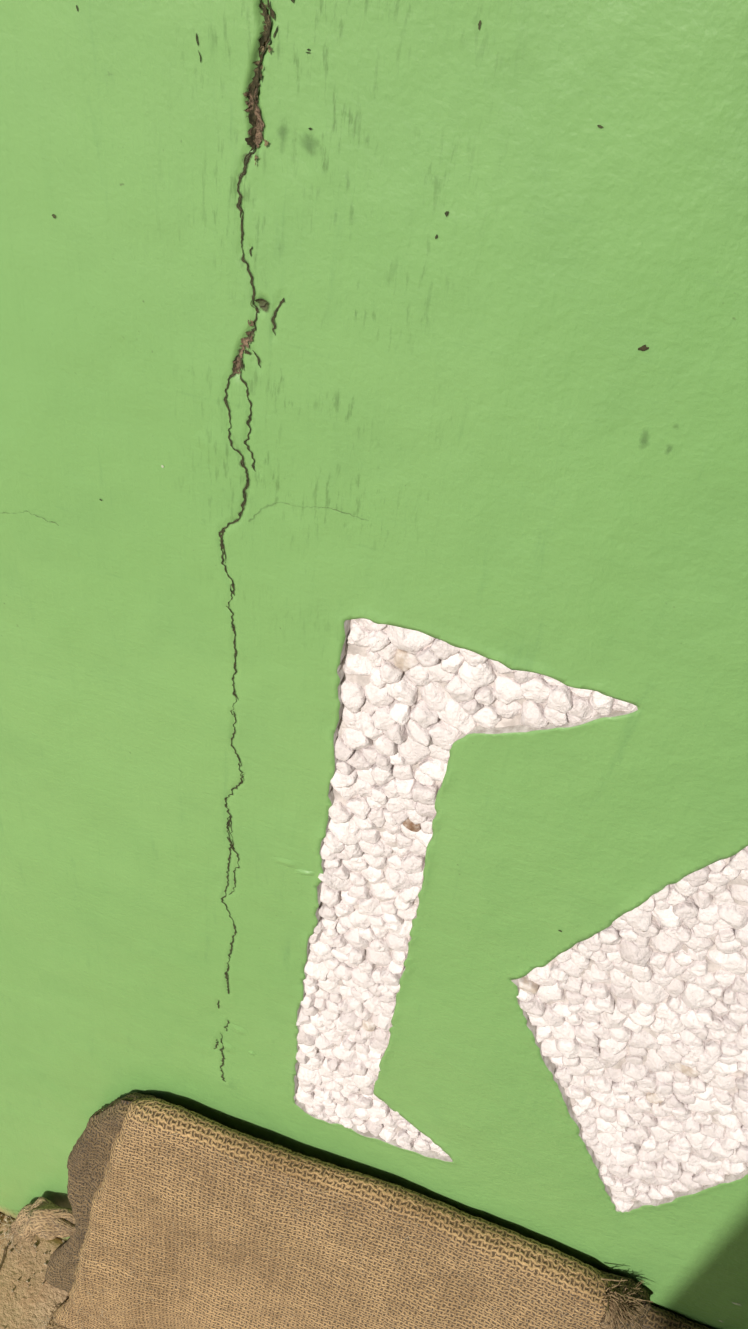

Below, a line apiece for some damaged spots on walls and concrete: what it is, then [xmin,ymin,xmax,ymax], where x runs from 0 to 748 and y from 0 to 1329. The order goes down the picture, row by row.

crack [214,0,294,1081]